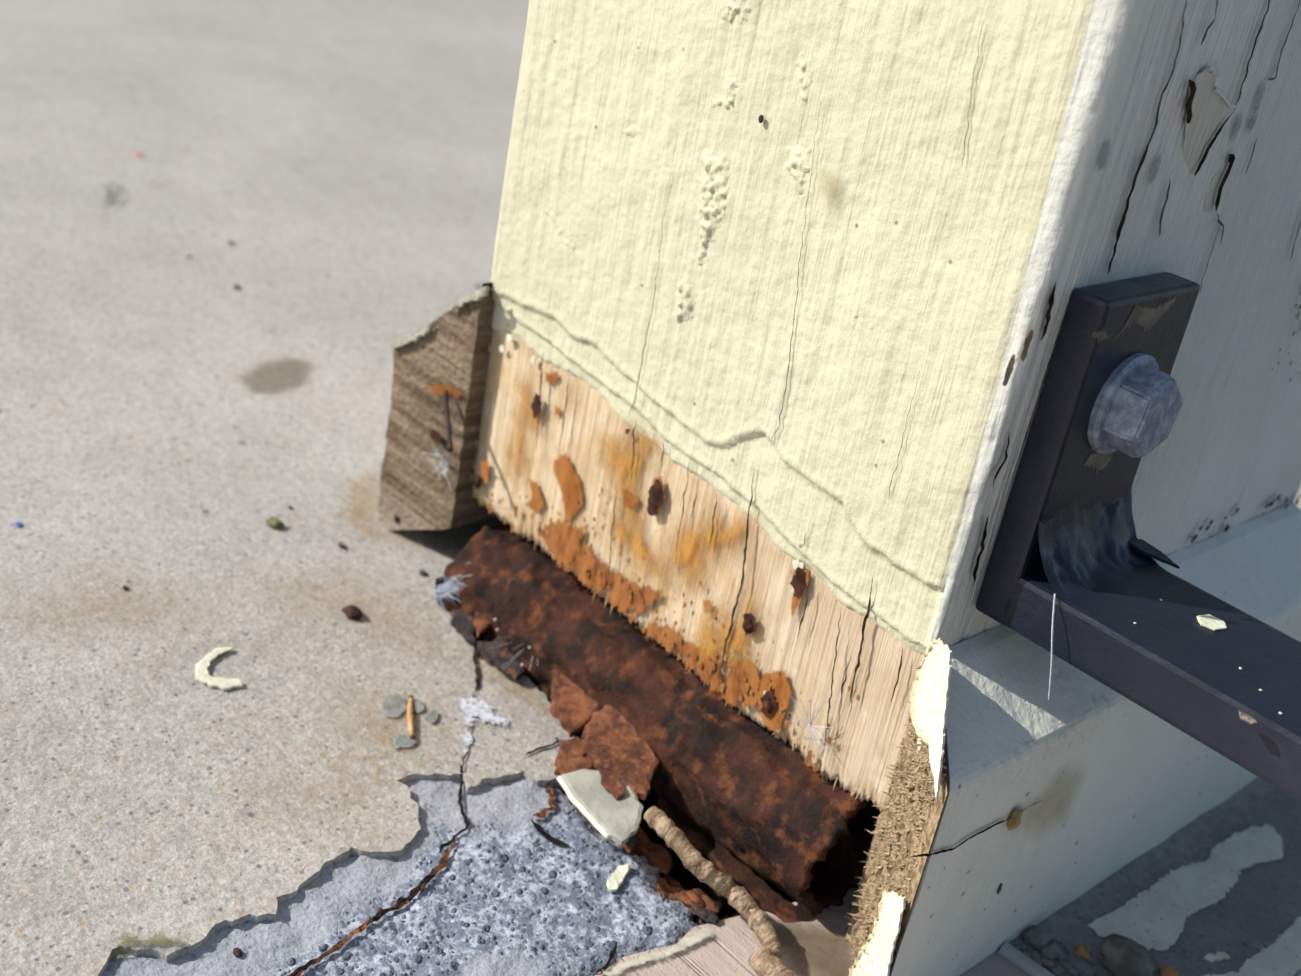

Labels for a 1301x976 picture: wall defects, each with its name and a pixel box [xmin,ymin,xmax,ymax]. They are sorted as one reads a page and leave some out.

peeling [1183,66,1237,173]
leakage [242,359,308,392]
spalling [101,769,698,976]
crack [438,637,482,854]
corrosion [450,608,525,690]
corrosion [473,372,802,733]
corrosion [532,670,815,923]
crack [716,475,754,690]
corrosion [790,567,809,615]
crack [822,578,873,757]
peeling [1087,824,1284,951]
peeling [1203,916,1301,976]